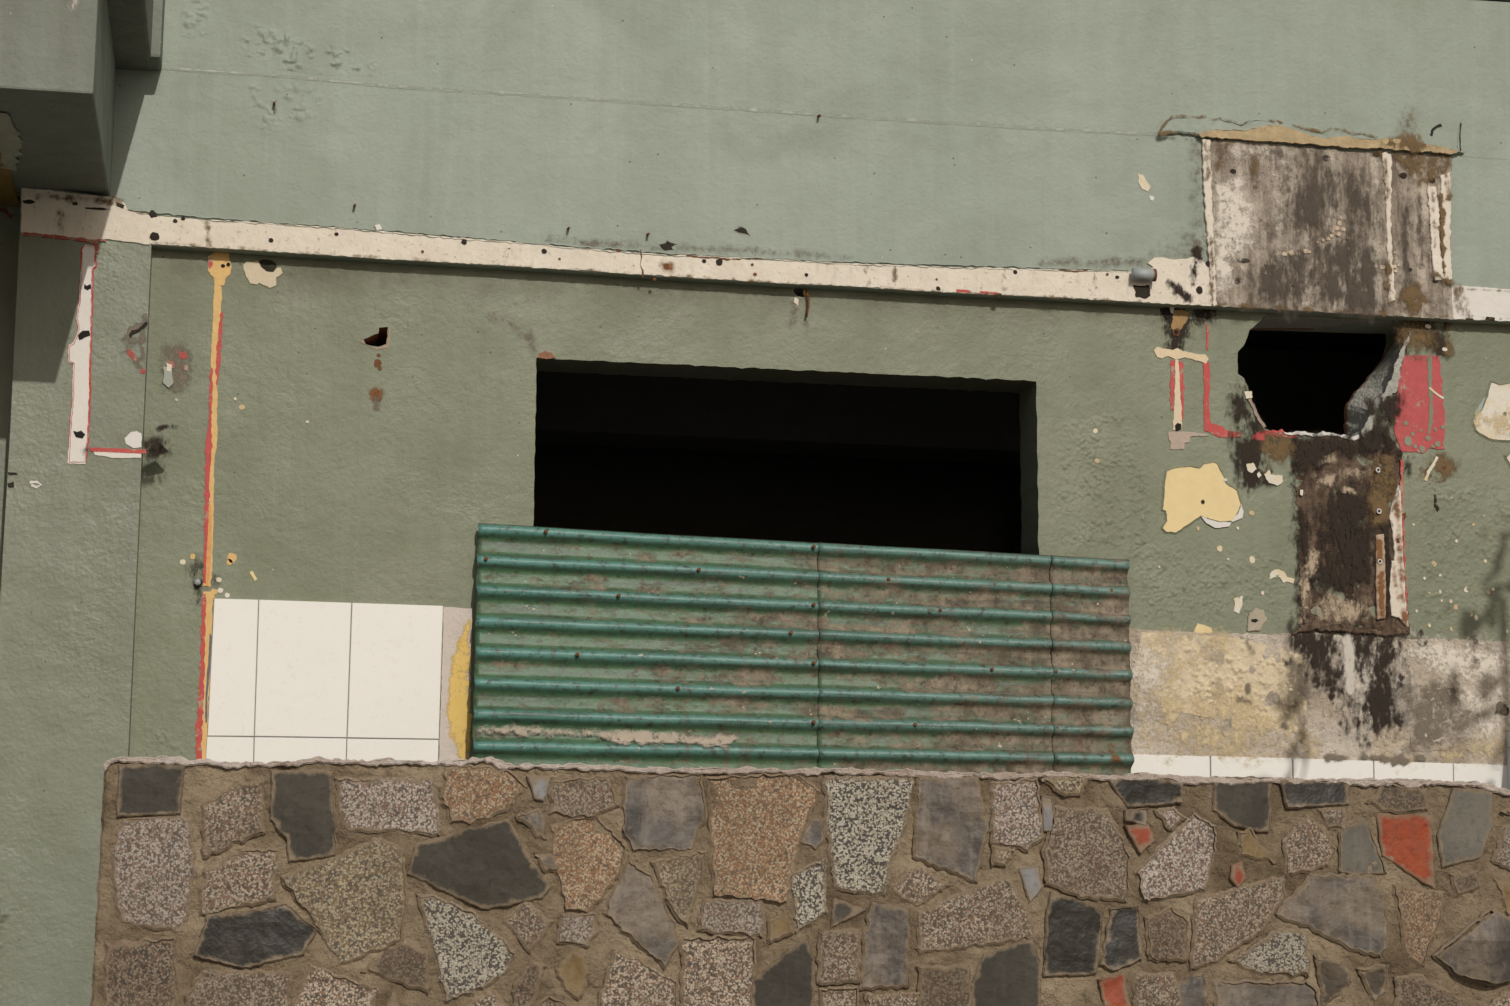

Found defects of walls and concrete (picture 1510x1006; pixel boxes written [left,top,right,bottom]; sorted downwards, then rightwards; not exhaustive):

peeling [0,113,23,171]
spalling [1158,114,1465,161]
peeling [1138,174,1154,201]
peeling [1154,278,1510,560]
spalling [7,472,42,488]
peeling [21,188,1213,759]
leakage [1368,454,1400,525]
leakage [1395,537,1409,624]
spalling [1137,569,1309,735]
leakage [1131,630,1510,767]
spalling [1410,561,1510,751]